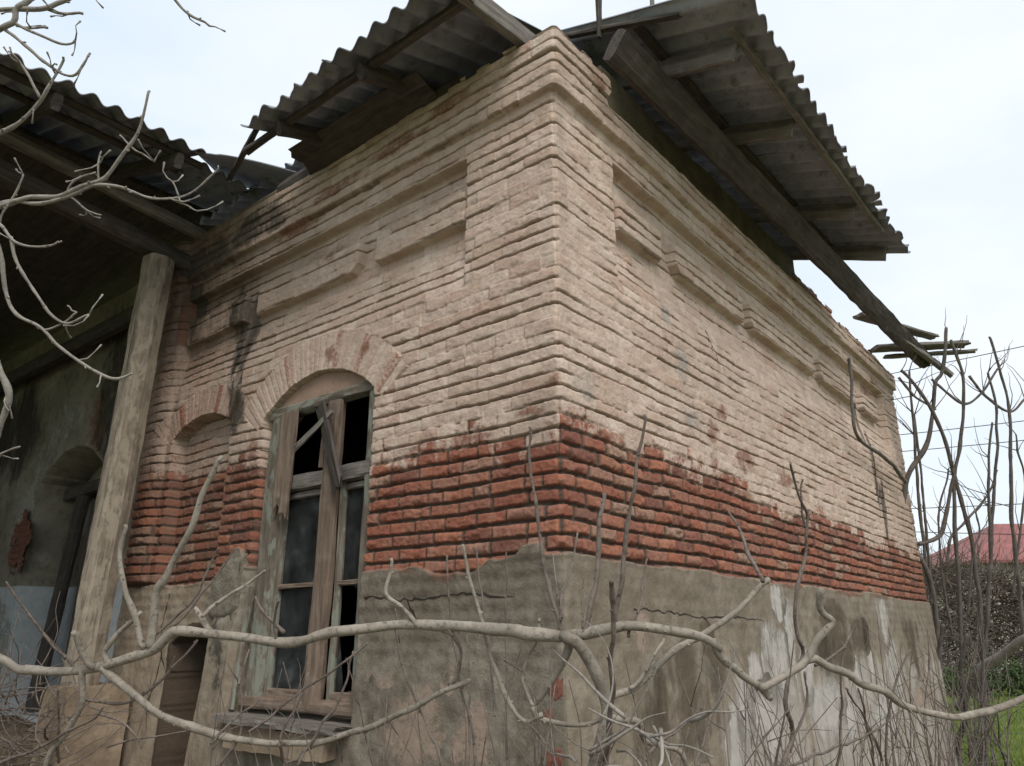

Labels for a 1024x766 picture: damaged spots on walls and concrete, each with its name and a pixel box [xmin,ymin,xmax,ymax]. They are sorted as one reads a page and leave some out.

leakage [183,200,287,340]
leakage [227,287,261,432]
flaking render [7,509,33,575]
crack [364,592,513,642]
crack [634,607,767,626]
leakage [819,600,867,679]